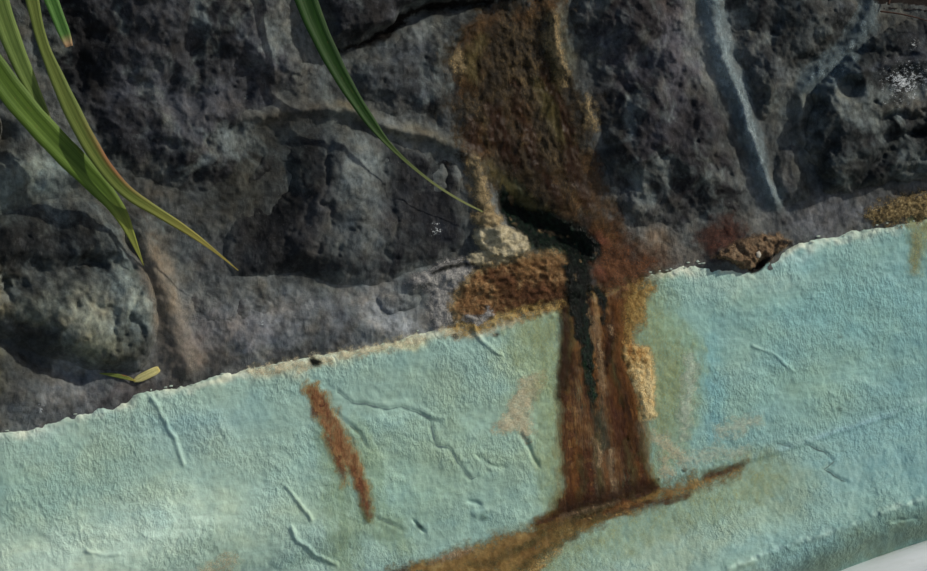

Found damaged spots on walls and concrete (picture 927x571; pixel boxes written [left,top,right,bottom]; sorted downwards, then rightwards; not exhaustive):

rust [301,380,375,518]
water stain [403,0,637,331]
rust [447,220,694,518]
spalling [684,233,793,273]